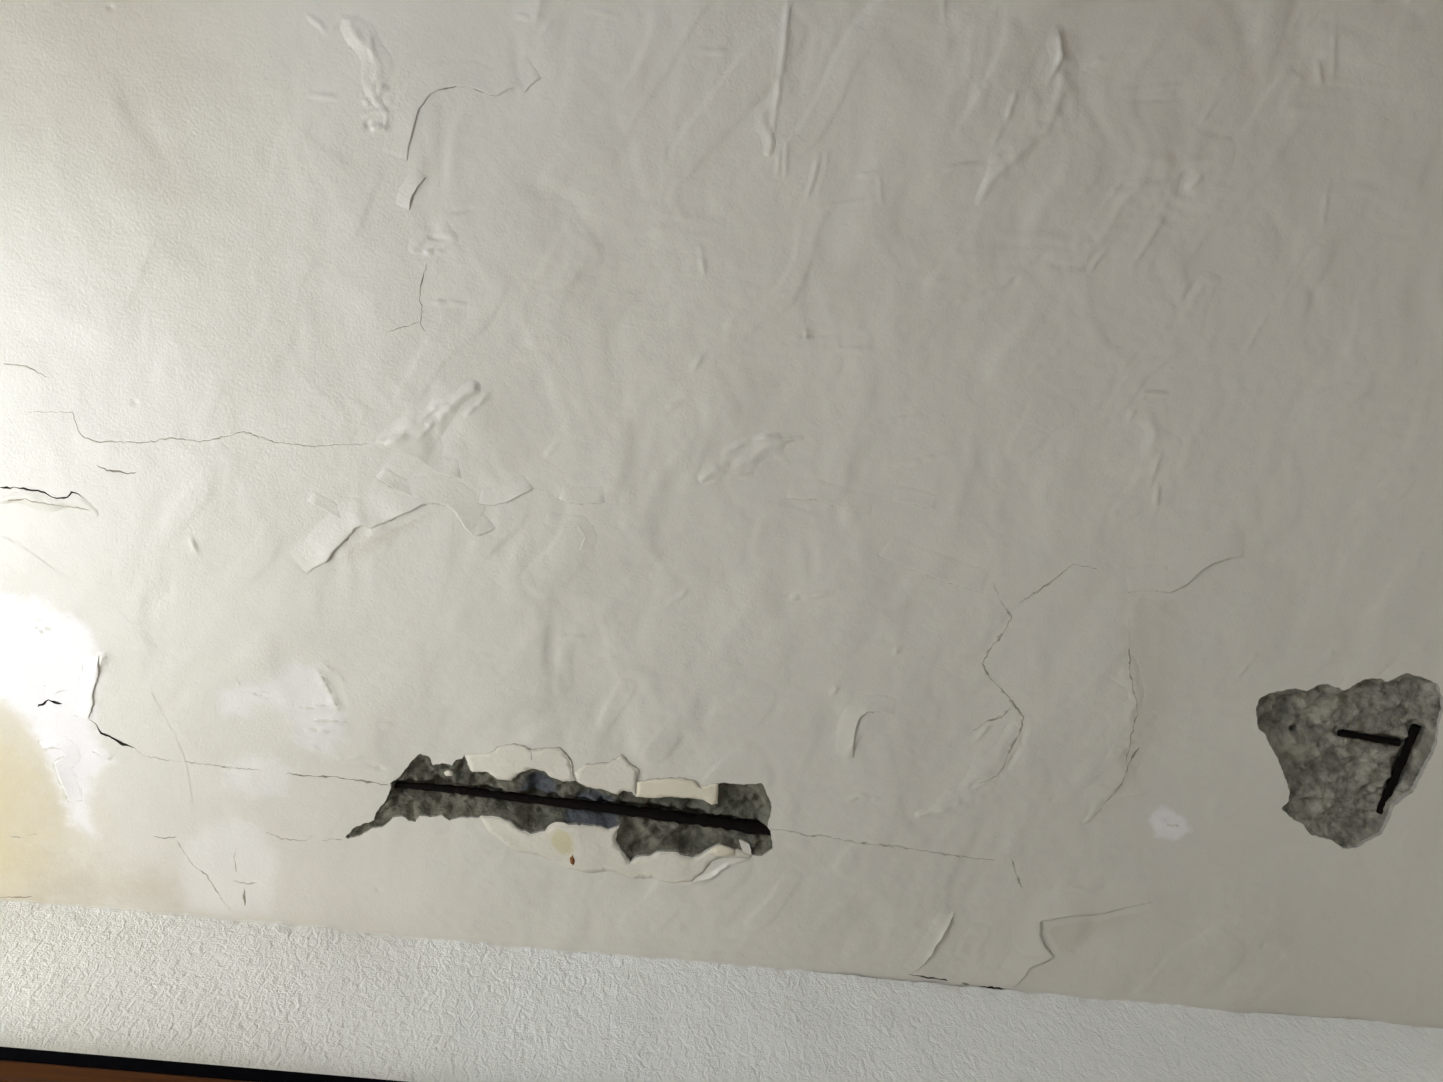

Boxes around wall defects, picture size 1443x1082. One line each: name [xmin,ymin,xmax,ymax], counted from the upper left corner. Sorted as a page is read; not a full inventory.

crack [0,411,363,511]
leakage [0,536,378,925]
crack [38,690,387,785]
crack [266,832,341,841]
spalling [346,743,773,883]
crack [772,829,1022,888]
crack [972,564,1096,783]
crack [1093,627,1140,817]
spalling [1256,673,1443,849]